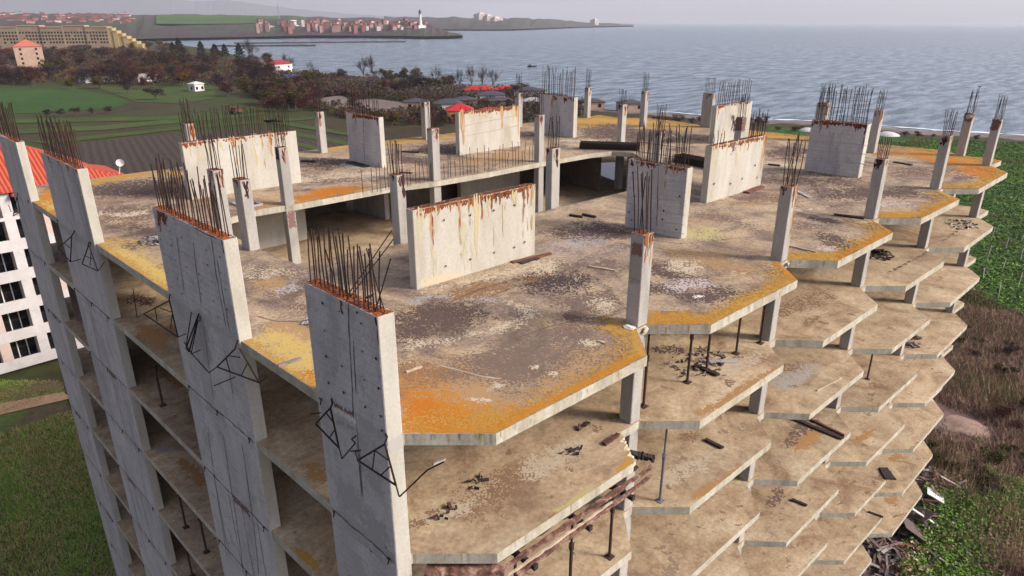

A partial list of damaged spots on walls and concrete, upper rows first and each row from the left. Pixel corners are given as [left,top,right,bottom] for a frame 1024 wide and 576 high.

rust [348,112,380,126]
rust [180,123,295,169]
rust [153,205,236,253]
rust [385,94,1007,433]
rust [306,278,394,345]